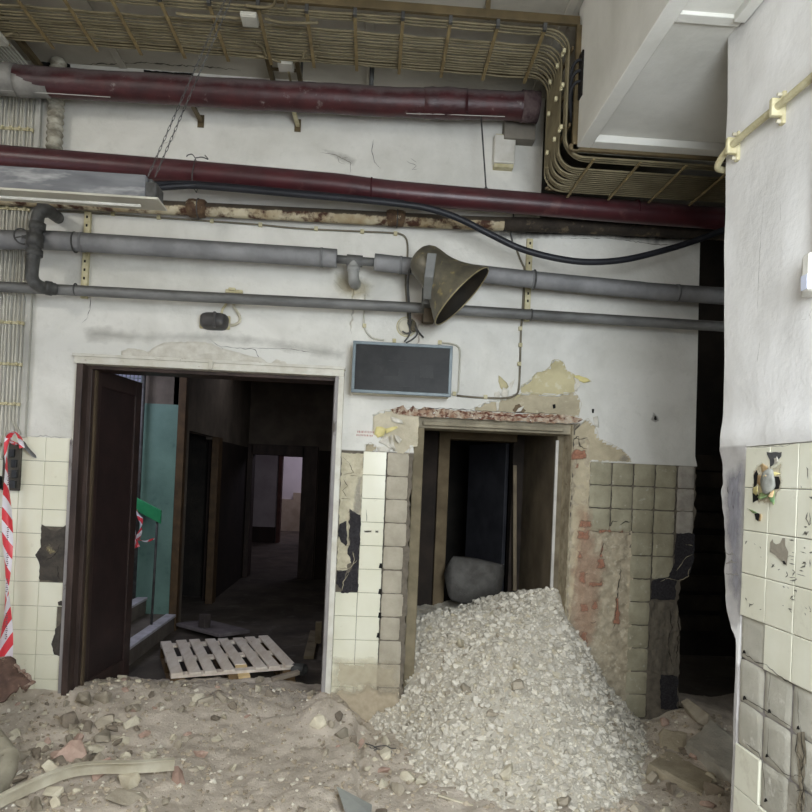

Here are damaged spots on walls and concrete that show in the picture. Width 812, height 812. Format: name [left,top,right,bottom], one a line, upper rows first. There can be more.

spalling [747,452,782,521]
peeling [35,525,66,582]
peeling [336,359,695,718]
peeling [770,538,788,566]
crack [744,653,806,812]